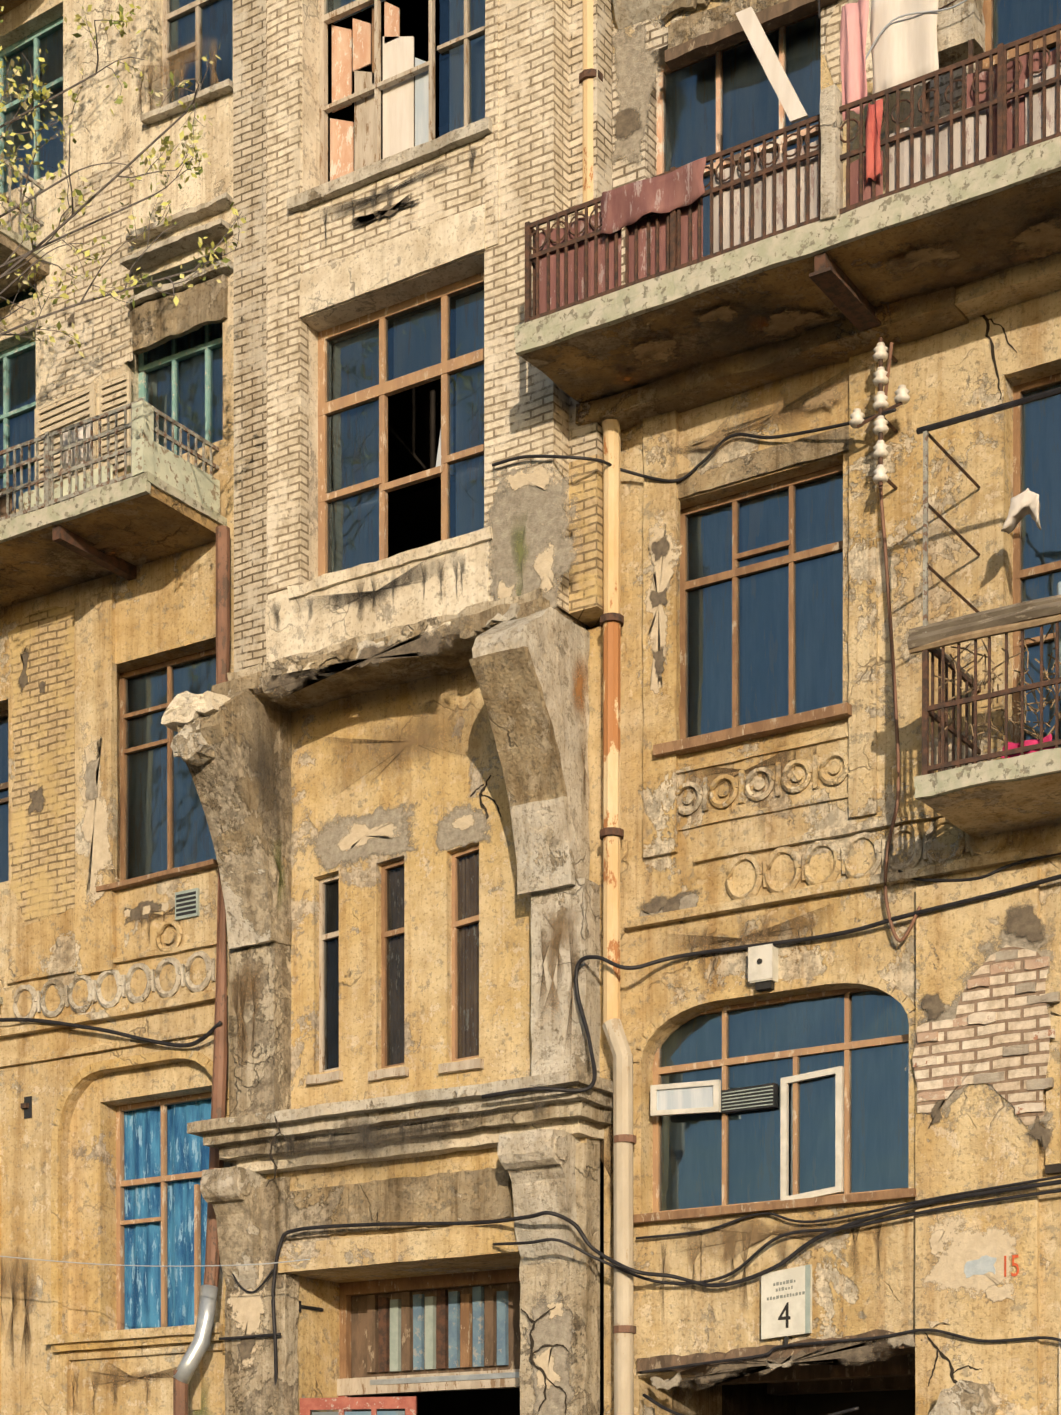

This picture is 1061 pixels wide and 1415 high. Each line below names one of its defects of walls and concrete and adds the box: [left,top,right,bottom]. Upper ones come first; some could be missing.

crack [980,315,1017,400]
peeling [644,510,683,696]
peeling [308,803,417,869]
peeling [436,803,491,853]
flaking render [909,905,1061,1150]
crack [521,1306,570,1415]
peeling [766,1354,793,1369]